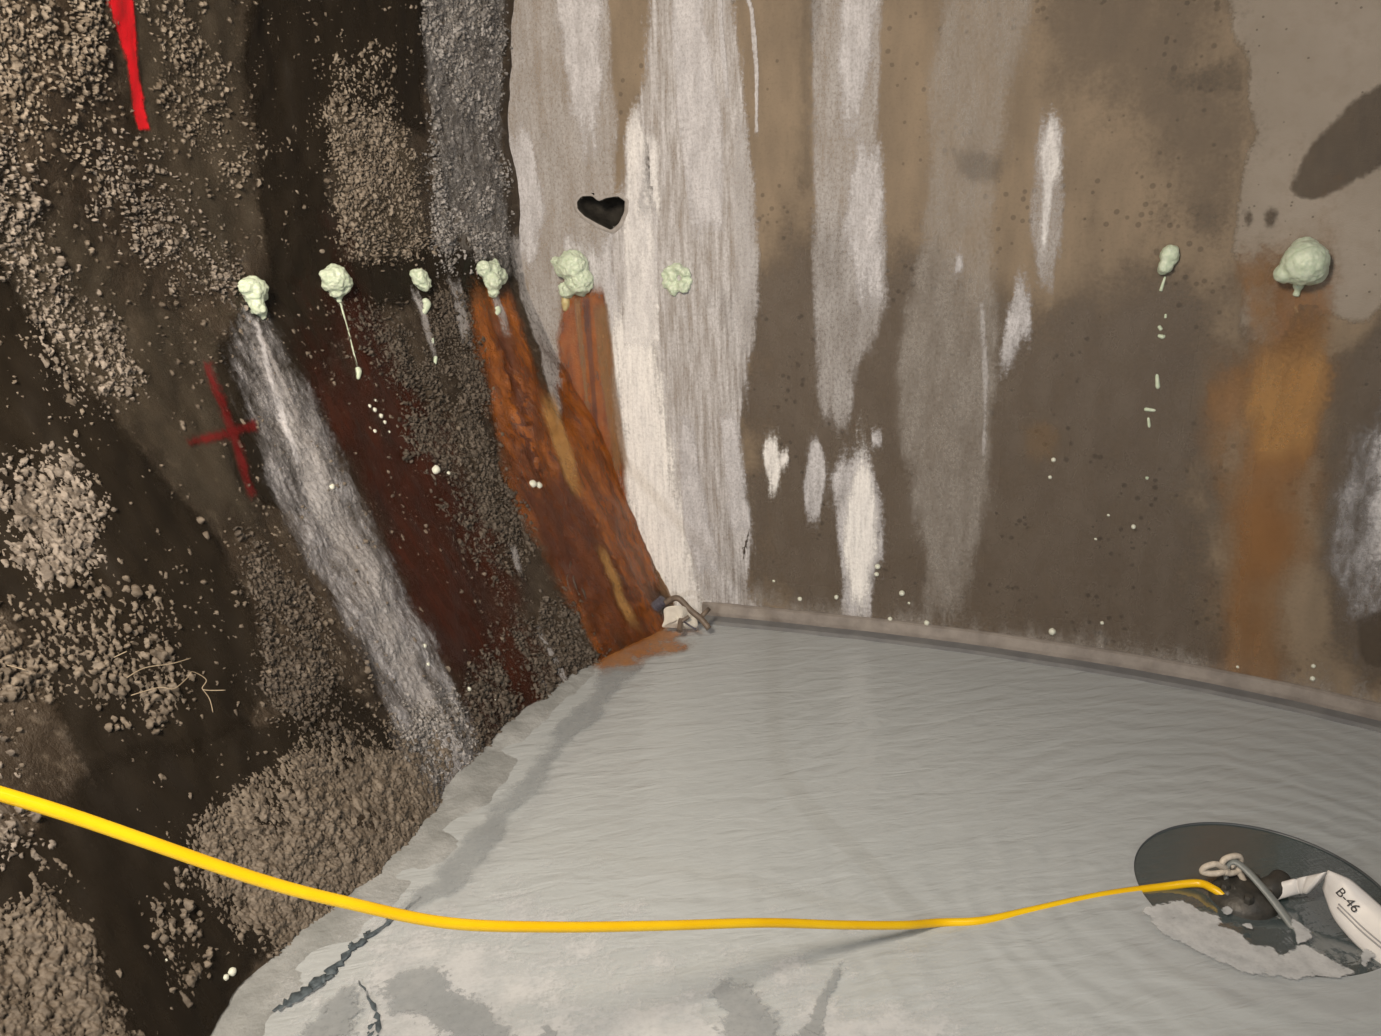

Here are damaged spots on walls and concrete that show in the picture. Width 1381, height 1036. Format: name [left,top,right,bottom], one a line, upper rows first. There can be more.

leakage [1292,86,1381,198]
corrosion [309,274,546,727]
corrosion [471,289,687,671]
leakage [0,0,1287,853]
corrosion [1209,271,1327,680]
leakage [1250,310,1381,703]
leakage [0,817,277,1036]
crack [272,897,421,1036]